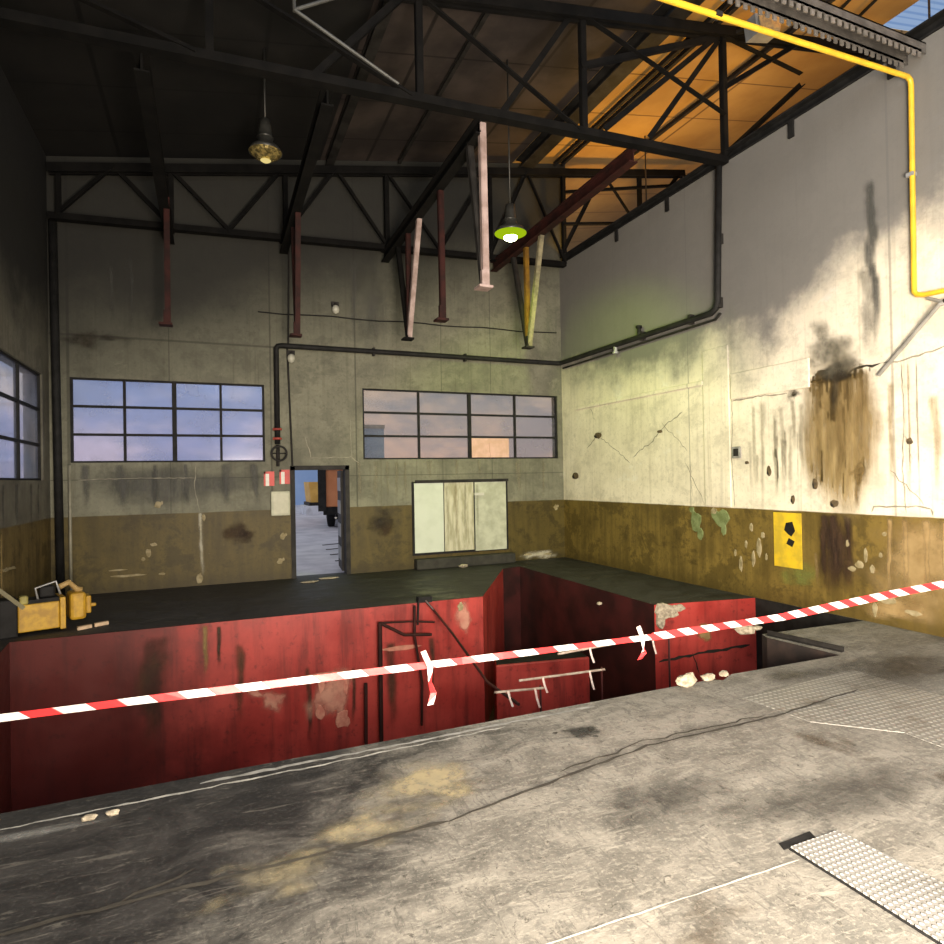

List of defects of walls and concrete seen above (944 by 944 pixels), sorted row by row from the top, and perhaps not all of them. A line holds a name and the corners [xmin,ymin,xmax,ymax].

damp [865,184,879,319]
crack [587,410,704,503]
peeling [689,507,730,540]
spalling [0,596,495,814]